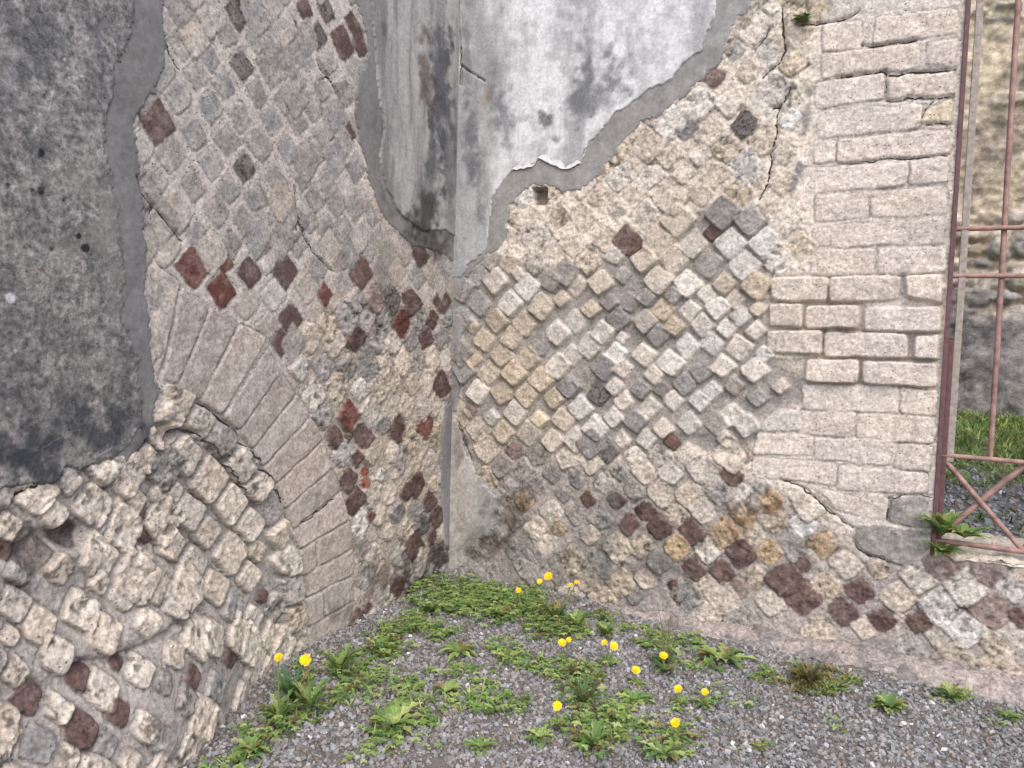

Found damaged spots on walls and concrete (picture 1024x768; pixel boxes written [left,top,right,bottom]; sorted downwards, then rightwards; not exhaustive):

damp [415,190,452,254]
damp [428,28,453,178]
flaking render [370,0,716,278]
crack [757,8,858,200]